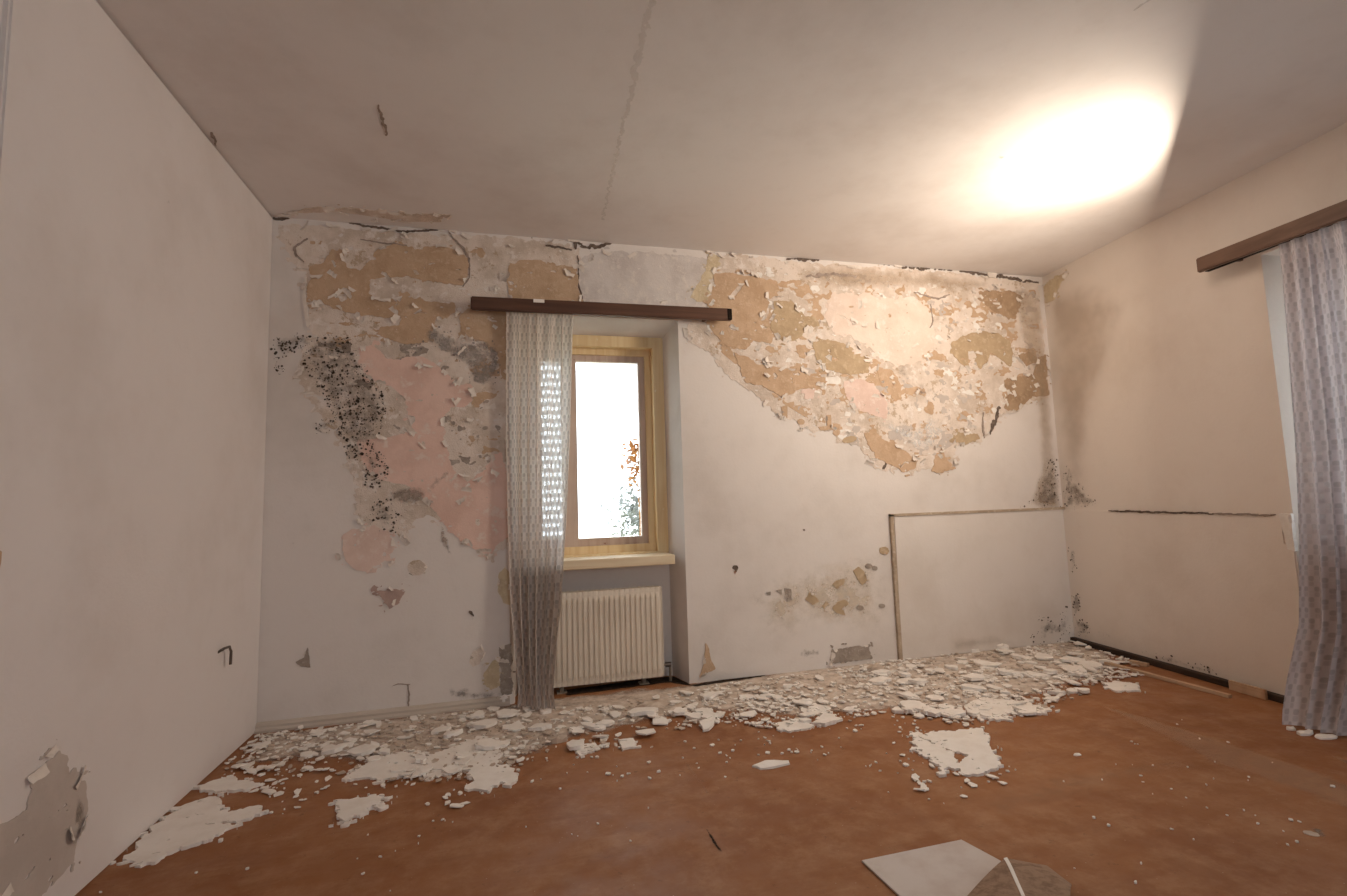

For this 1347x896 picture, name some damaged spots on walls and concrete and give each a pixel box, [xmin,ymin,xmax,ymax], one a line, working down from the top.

damp [270,335,423,533]
peeling [276,204,1069,615]
peeling [699,643,716,678]
peeling [0,739,91,896]